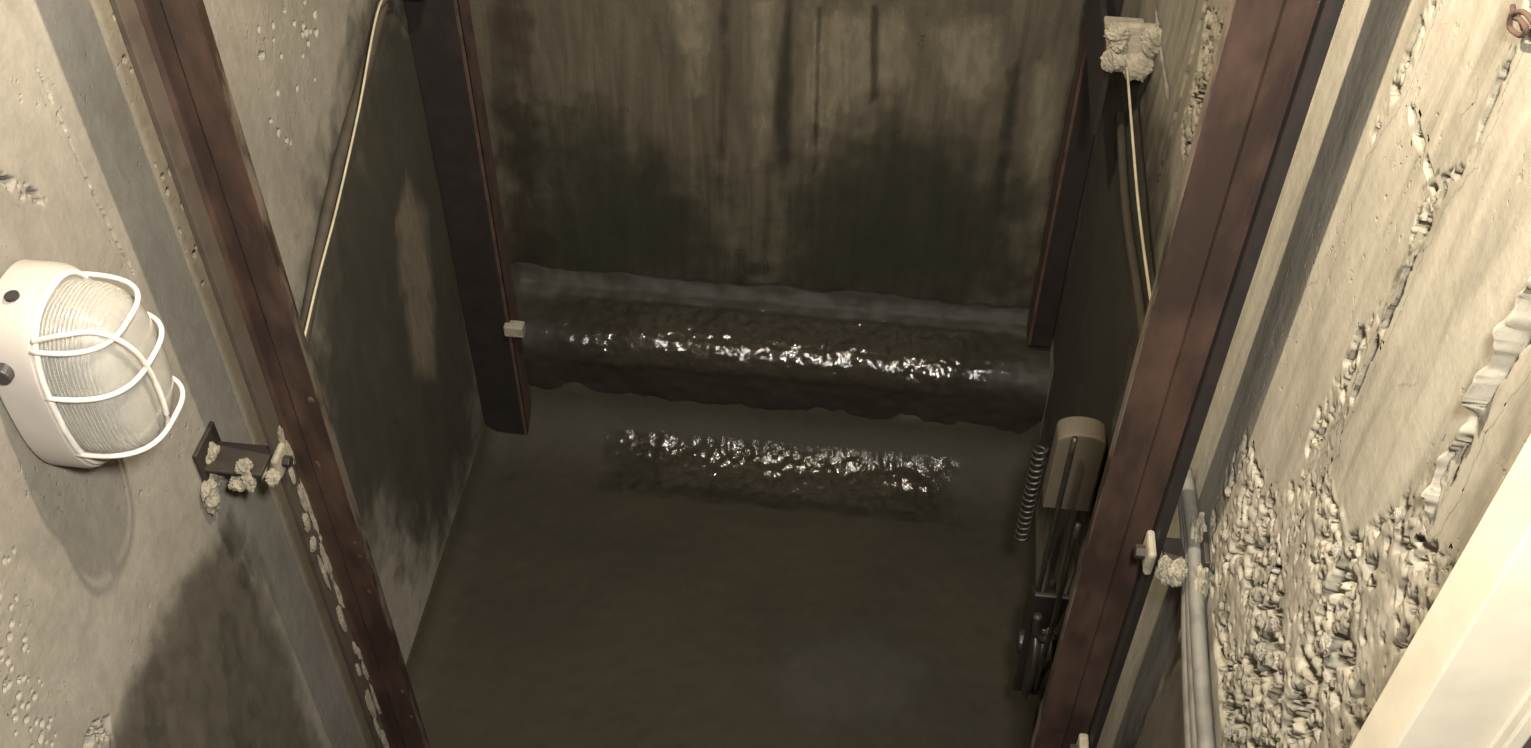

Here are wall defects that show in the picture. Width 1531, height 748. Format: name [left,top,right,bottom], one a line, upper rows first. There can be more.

water stain [520,126,742,286]
water stain [670,0,710,95]
water stain [752,0,1022,307]
water stain [1026,63,1054,184]
spalling [1179,0,1228,181]
spalling [1207,133,1531,748]